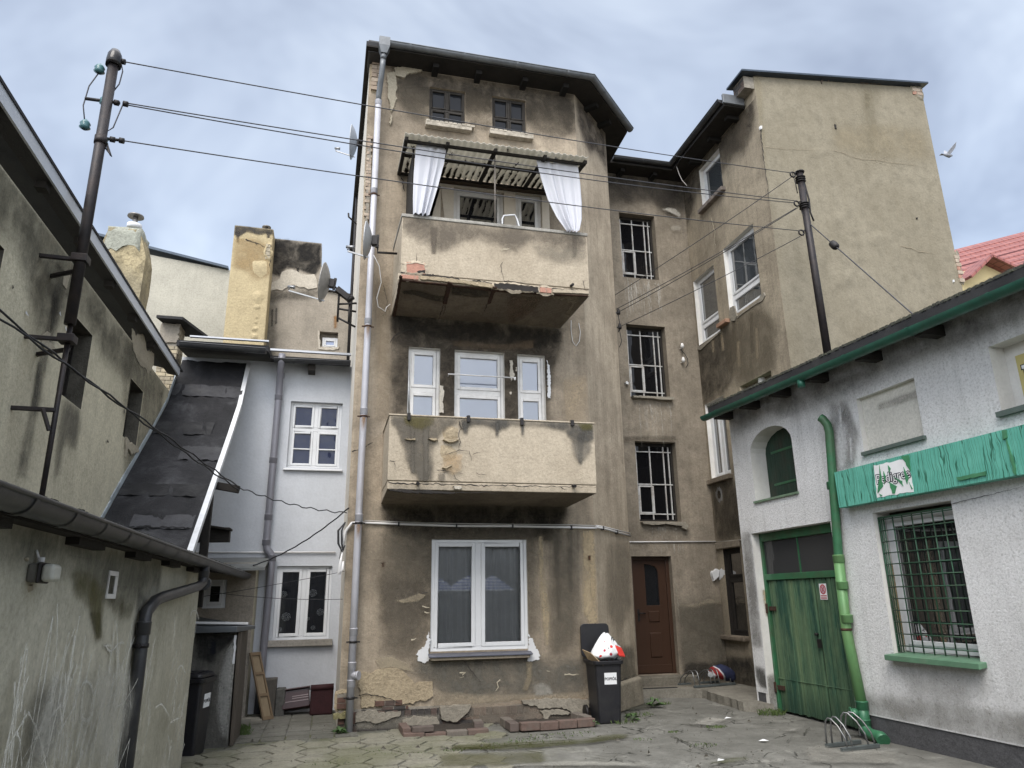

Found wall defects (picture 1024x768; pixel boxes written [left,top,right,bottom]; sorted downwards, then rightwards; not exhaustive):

flaking render [370,62,422,126]
flaking render [263,243,273,261]
spalling [393,260,589,317]
flaking render [132,328,154,374]
damp [32,355,47,416]
damp [392,416,525,481]
damp [540,379,593,462]
damp [21,534,160,601]
flaking render [334,667,439,725]
flaking render [521,697,589,719]